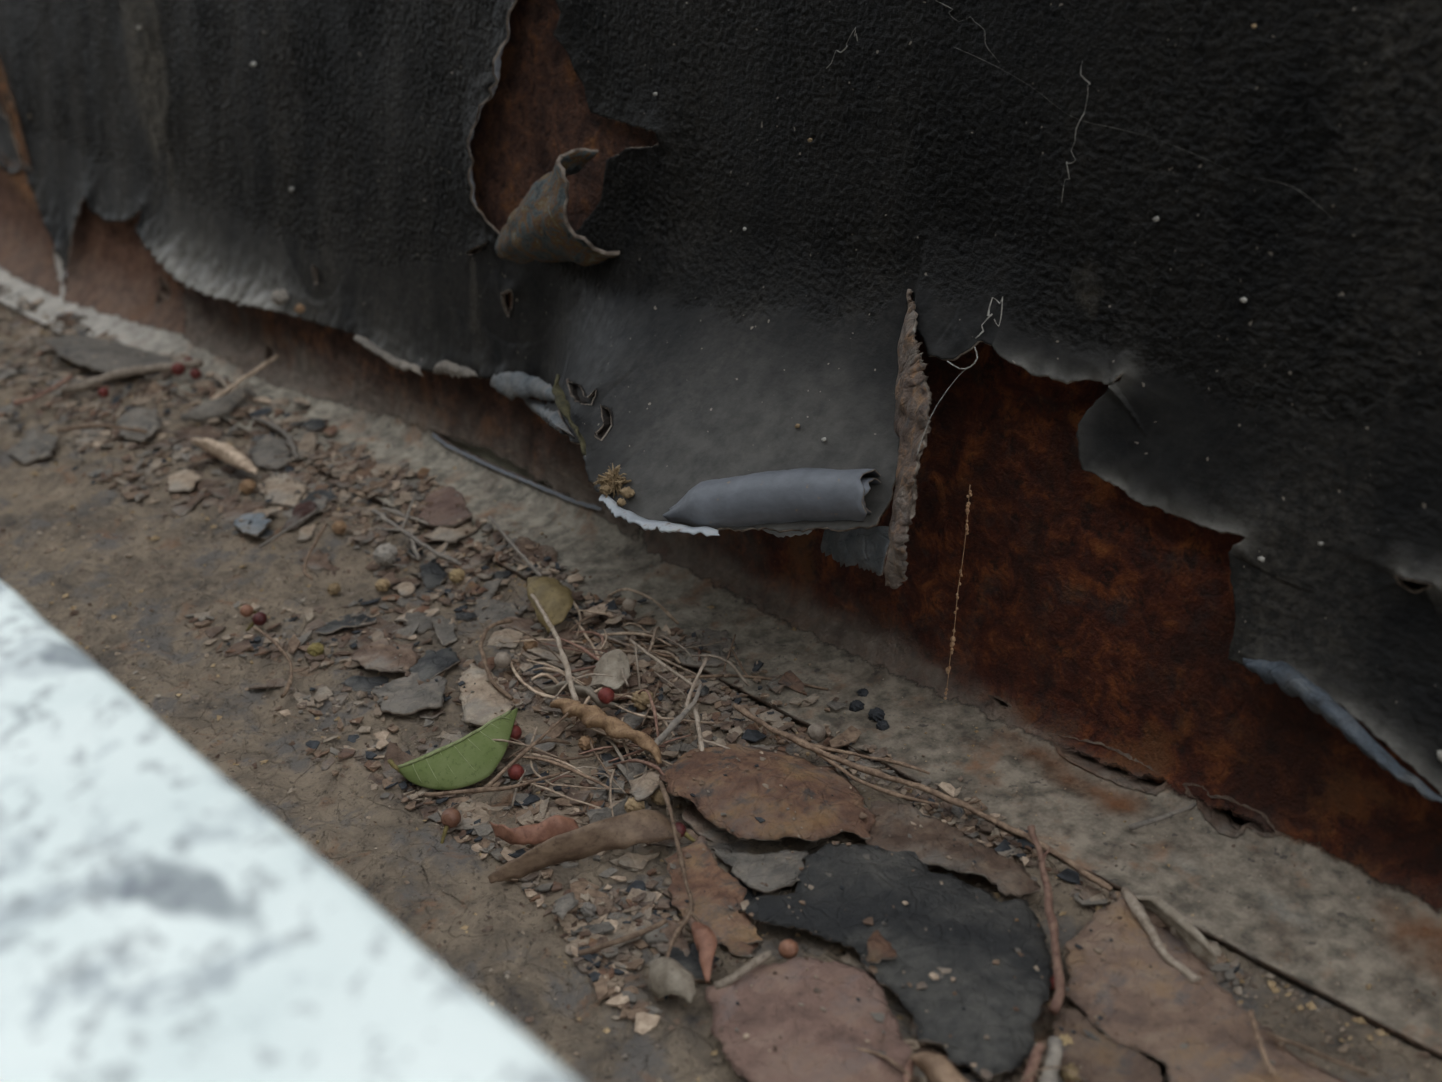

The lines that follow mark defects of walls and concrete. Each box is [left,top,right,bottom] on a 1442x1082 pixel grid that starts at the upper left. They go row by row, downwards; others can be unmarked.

peeling [466,0,659,266]
corrosion [0,73,1442,912]
peeling [599,289,932,589]
peeling [1243,658,1442,803]